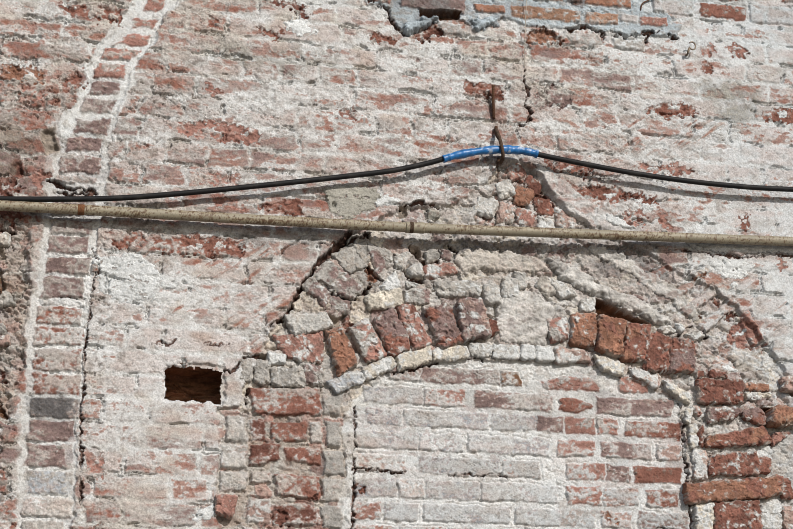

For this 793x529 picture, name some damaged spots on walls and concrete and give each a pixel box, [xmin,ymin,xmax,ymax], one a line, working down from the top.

spalling [412,23,444,44]
spalling [522,25,565,47]
crack [518,70,533,127]
crack [270,231,369,327]
crack [330,267,382,301]
spalling [710,296,768,354]
crack [60,270,100,500]
crack [677,403,689,483]